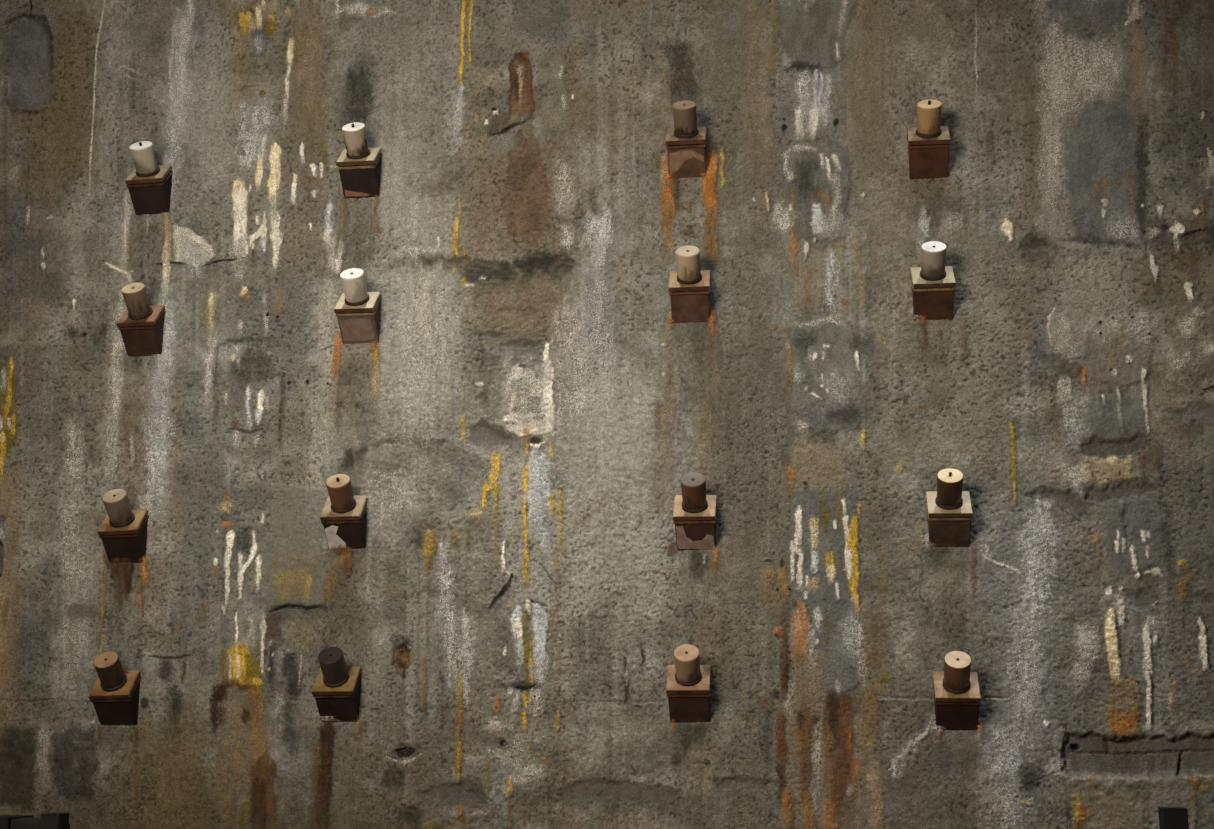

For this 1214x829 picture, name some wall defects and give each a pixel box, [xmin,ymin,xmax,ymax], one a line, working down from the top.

spalling [485,51,534,136]
water stain [753,0,885,312]
water stain [203,0,331,448]
water stain [309,203,344,270]
spalling [416,225,574,286]
rust [660,143,718,264]
spalling [1083,436,1144,461]
crack [489,570,552,609]
water stain [762,438,890,743]
spalling [392,634,410,677]
rust [761,598,866,829]
rust [1107,677,1139,739]